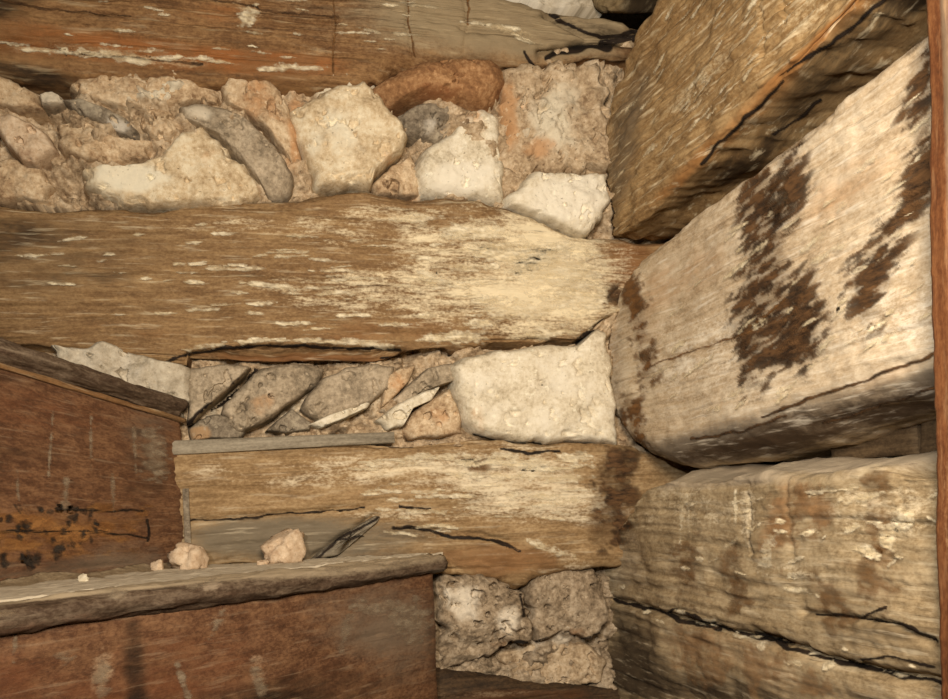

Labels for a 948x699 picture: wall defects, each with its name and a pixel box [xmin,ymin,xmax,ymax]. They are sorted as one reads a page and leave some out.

crack [700,0,886,165]
crack [690,352,934,440]
crack [473,434,561,455]
crack [190,505,521,559]
crack [613,598,942,685]